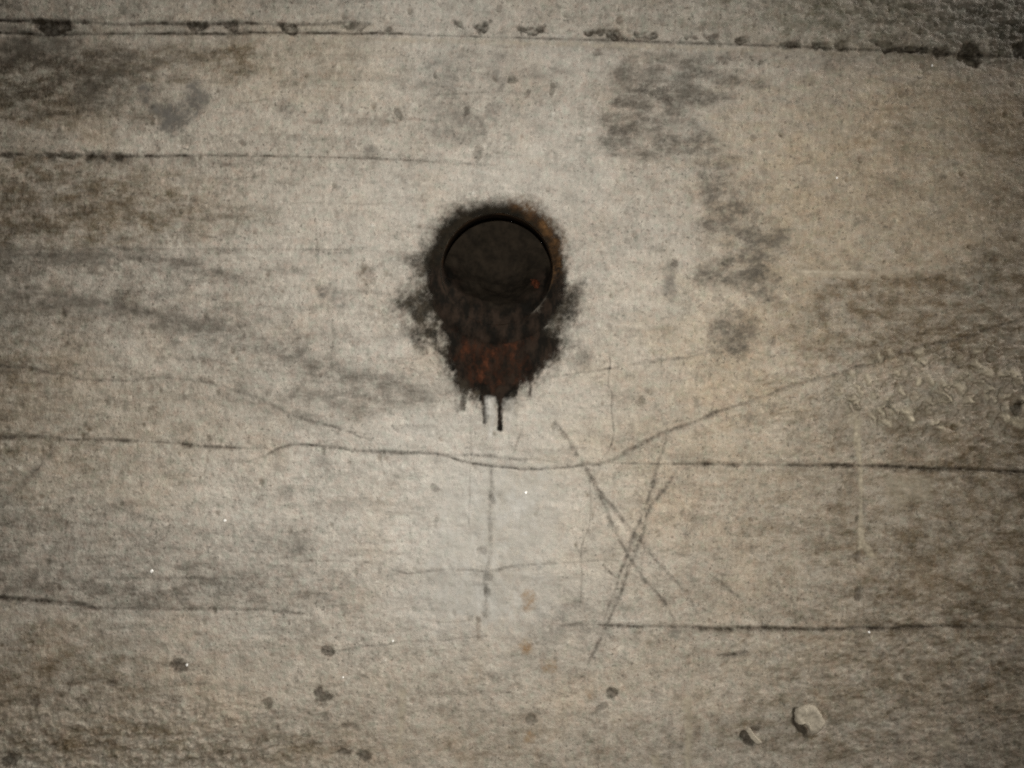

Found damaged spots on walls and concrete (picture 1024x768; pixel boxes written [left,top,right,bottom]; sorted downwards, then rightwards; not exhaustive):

damp [702,232,787,301]
corrosion [402,203,579,436]
crack [824,463,1024,474]
crack [0,596,52,604]
crack [700,624,927,632]